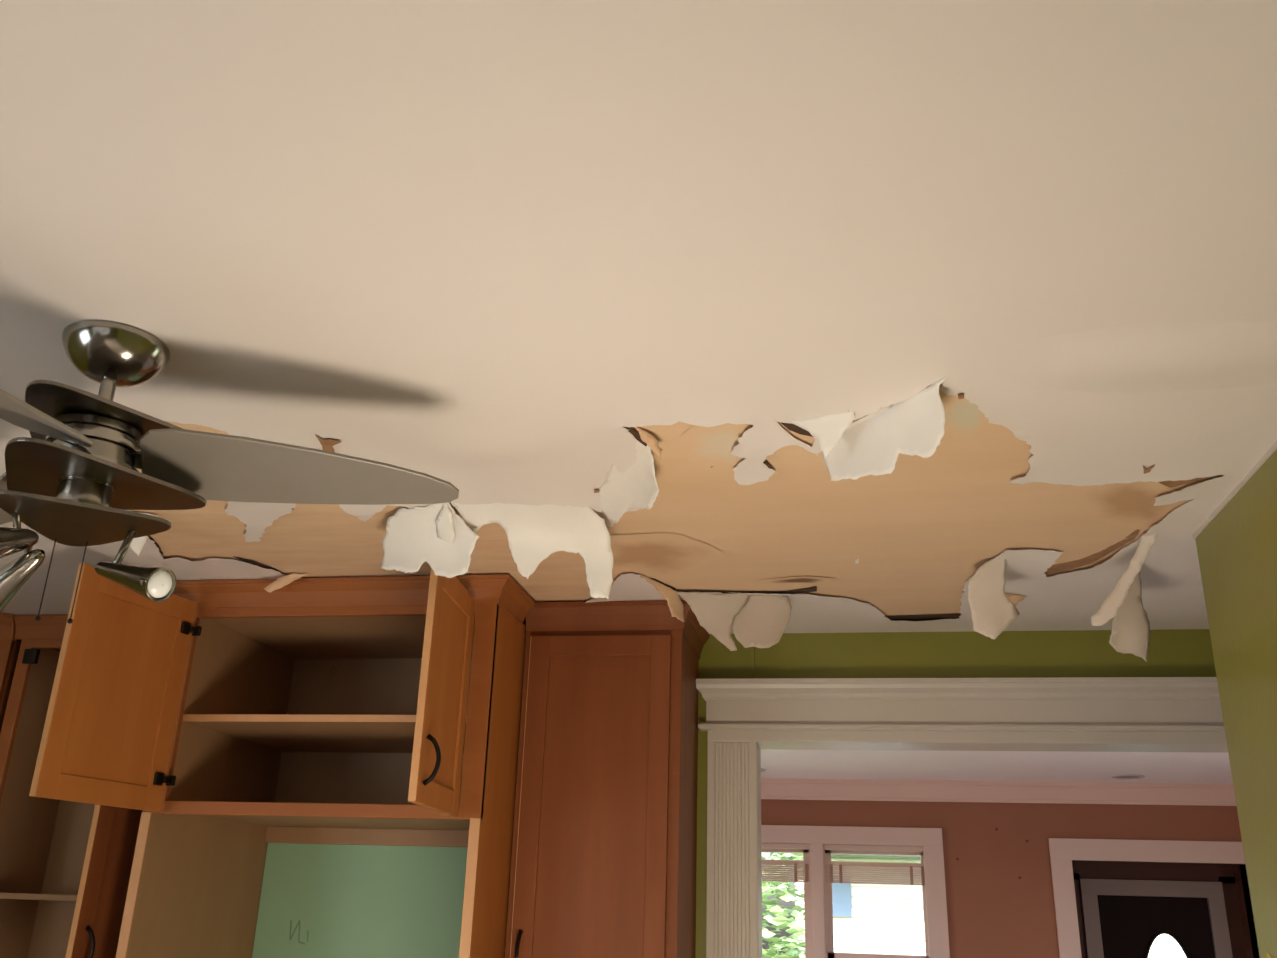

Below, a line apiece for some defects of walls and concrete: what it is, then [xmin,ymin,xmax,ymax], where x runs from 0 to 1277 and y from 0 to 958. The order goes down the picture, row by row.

peeling [122,376,1157,662]
peeling [1170,475,1224,501]